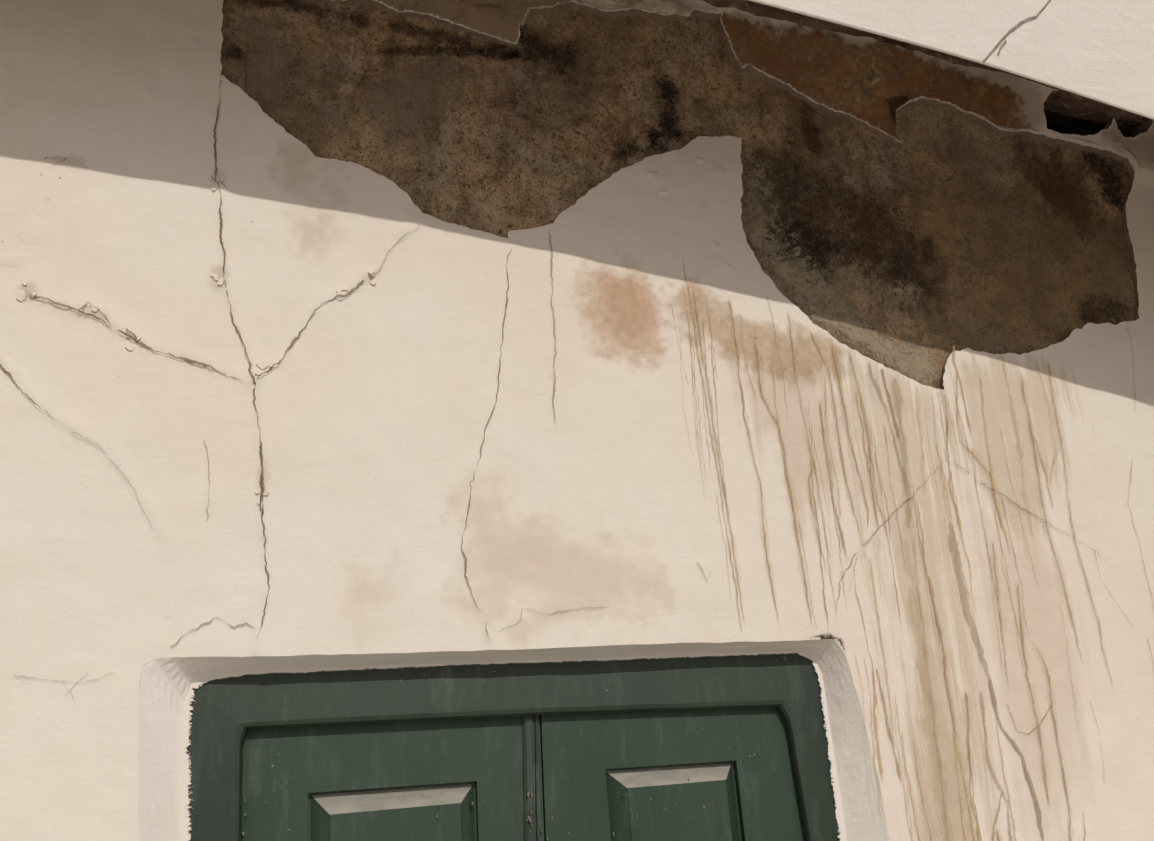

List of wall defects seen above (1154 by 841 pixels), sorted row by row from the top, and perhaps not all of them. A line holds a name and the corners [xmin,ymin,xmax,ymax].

crack [983,0,1051,63]
flaking render [222,0,1136,389]
crack [0,364,50,416]
crack [16,74,376,647]
crack [461,250,512,635]
water stain [592,274,658,350]
water stain [711,432,740,618]
water stain [785,473,799,544]
water stain [809,373,902,628]
water stain [867,670,931,841]
water stain [917,504,1049,841]
water stain [1052,710,1071,841]